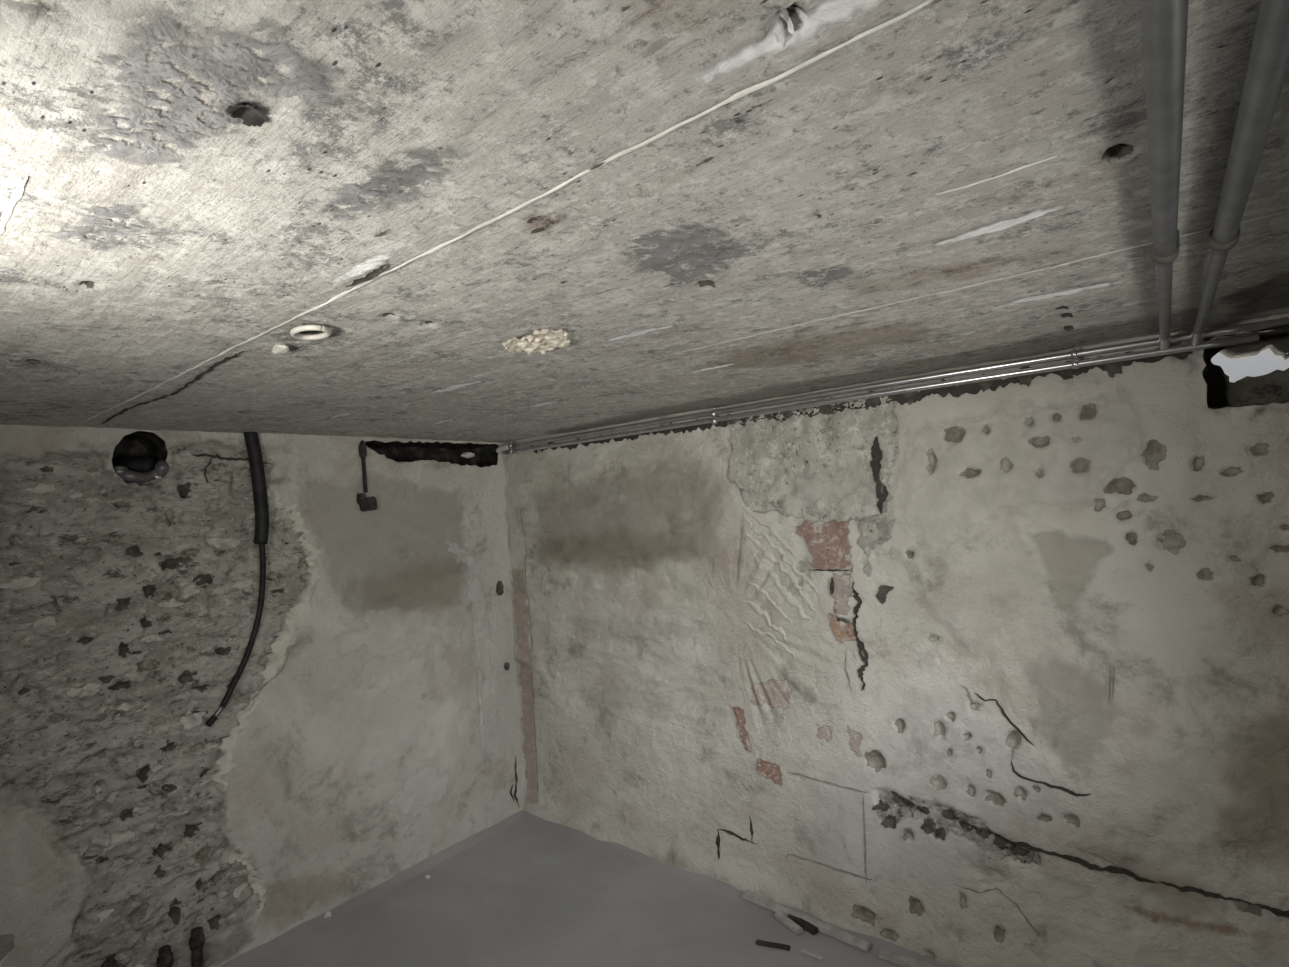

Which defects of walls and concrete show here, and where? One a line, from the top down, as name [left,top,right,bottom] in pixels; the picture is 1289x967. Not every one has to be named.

water stain [81,16,340,167]
water stain [628,225,727,284]
crack [102,351,244,424]
spalling [927,426,965,474]
spalling [1141,440,1166,470]
spalling [1095,477,1157,545]
crack [829,578,869,692]
flaking render [0,440,322,967]
flaking render [733,679,792,786]
crack [960,685,1091,797]
crack [954,884,1040,936]
crack [986,828,1289,918]